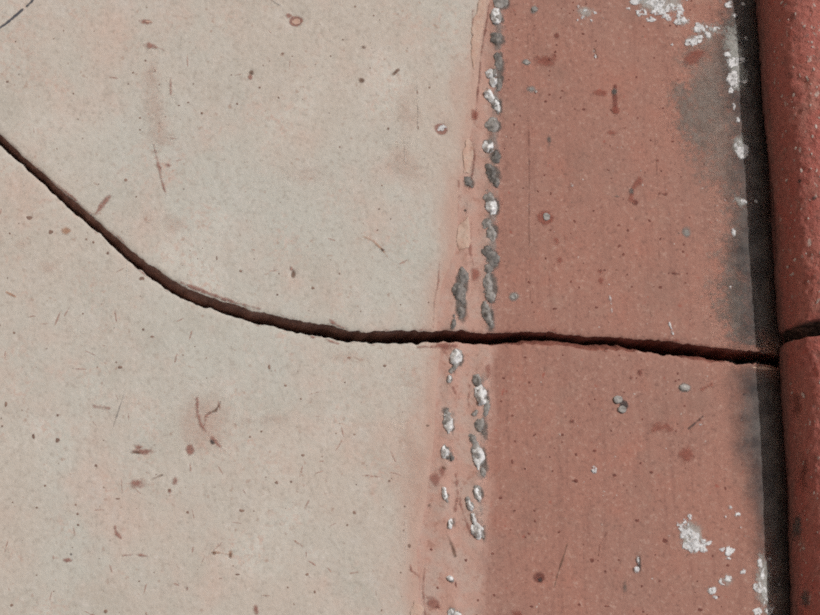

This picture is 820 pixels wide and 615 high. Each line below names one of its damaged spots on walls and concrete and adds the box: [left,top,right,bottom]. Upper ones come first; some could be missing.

crack [0,135,779,370]
water stain [673,0,779,340]
water stain [742,371,791,615]